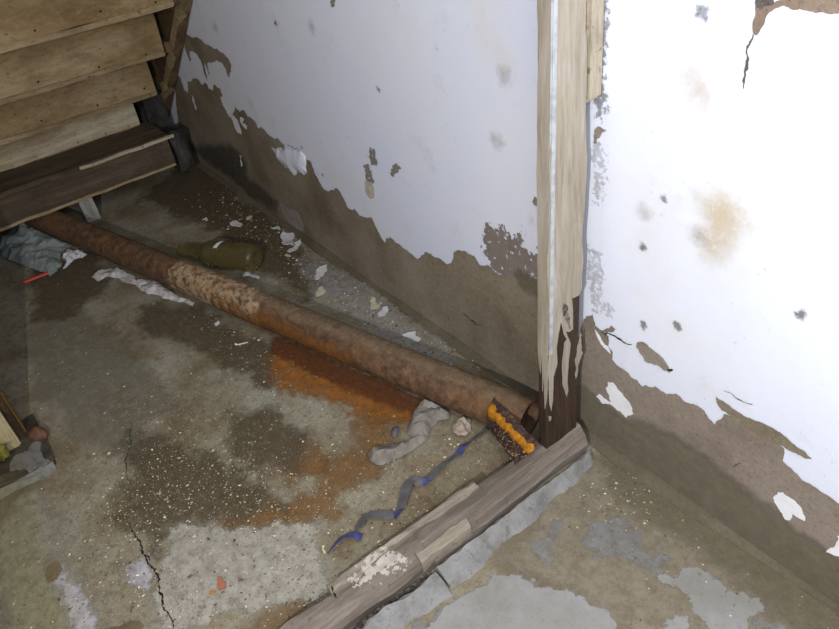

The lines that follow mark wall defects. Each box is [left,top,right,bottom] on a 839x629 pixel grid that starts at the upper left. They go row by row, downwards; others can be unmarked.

spalling [742,0,839,89]
peeling [175,34,539,397]
leakage [31,251,108,323]
leakage [300,259,450,362]
corrosion [254,337,423,527]
peeling [575,314,839,561]
crack [127,521,174,629]